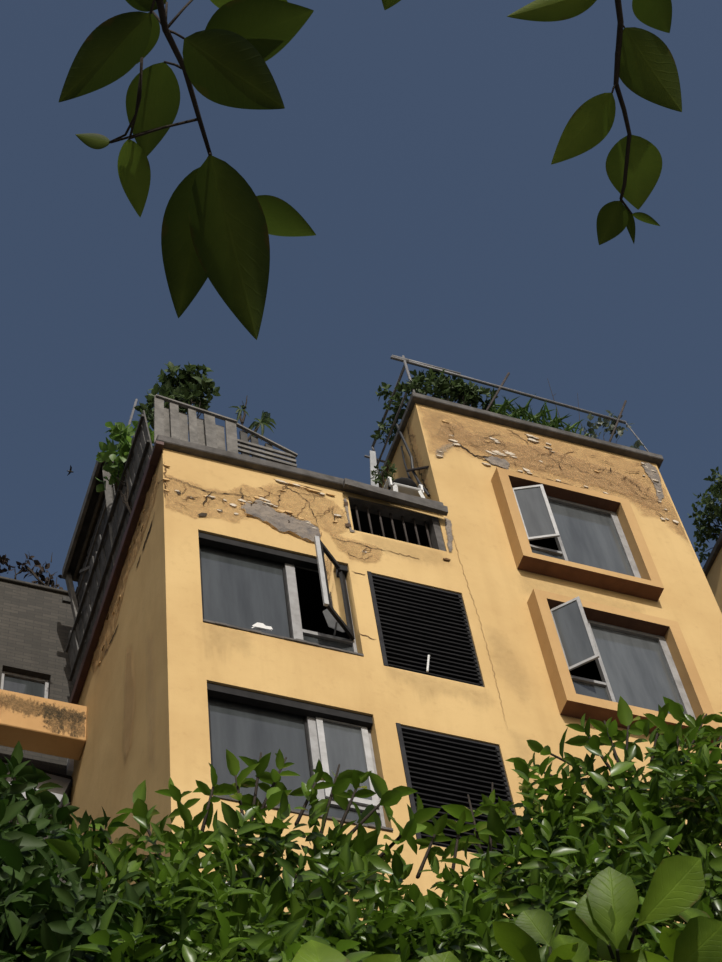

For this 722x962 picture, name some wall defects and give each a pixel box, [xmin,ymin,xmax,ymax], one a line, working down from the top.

spalling [436,434,461,458]
spalling [481,450,517,470]
spalling [641,462,679,524]
crack [98,462,335,666]
peeling [92,474,355,671]